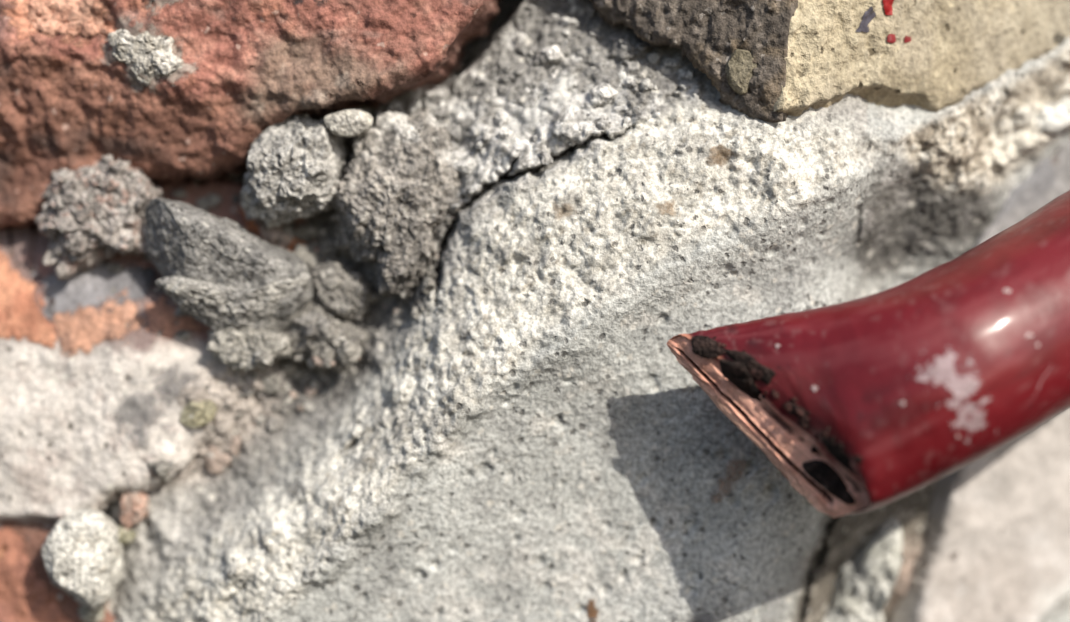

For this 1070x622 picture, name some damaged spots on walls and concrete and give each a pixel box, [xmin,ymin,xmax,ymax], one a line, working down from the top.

spalling [238,208,261,237]
crack [436,133,611,290]
spalling [0,243,210,357]